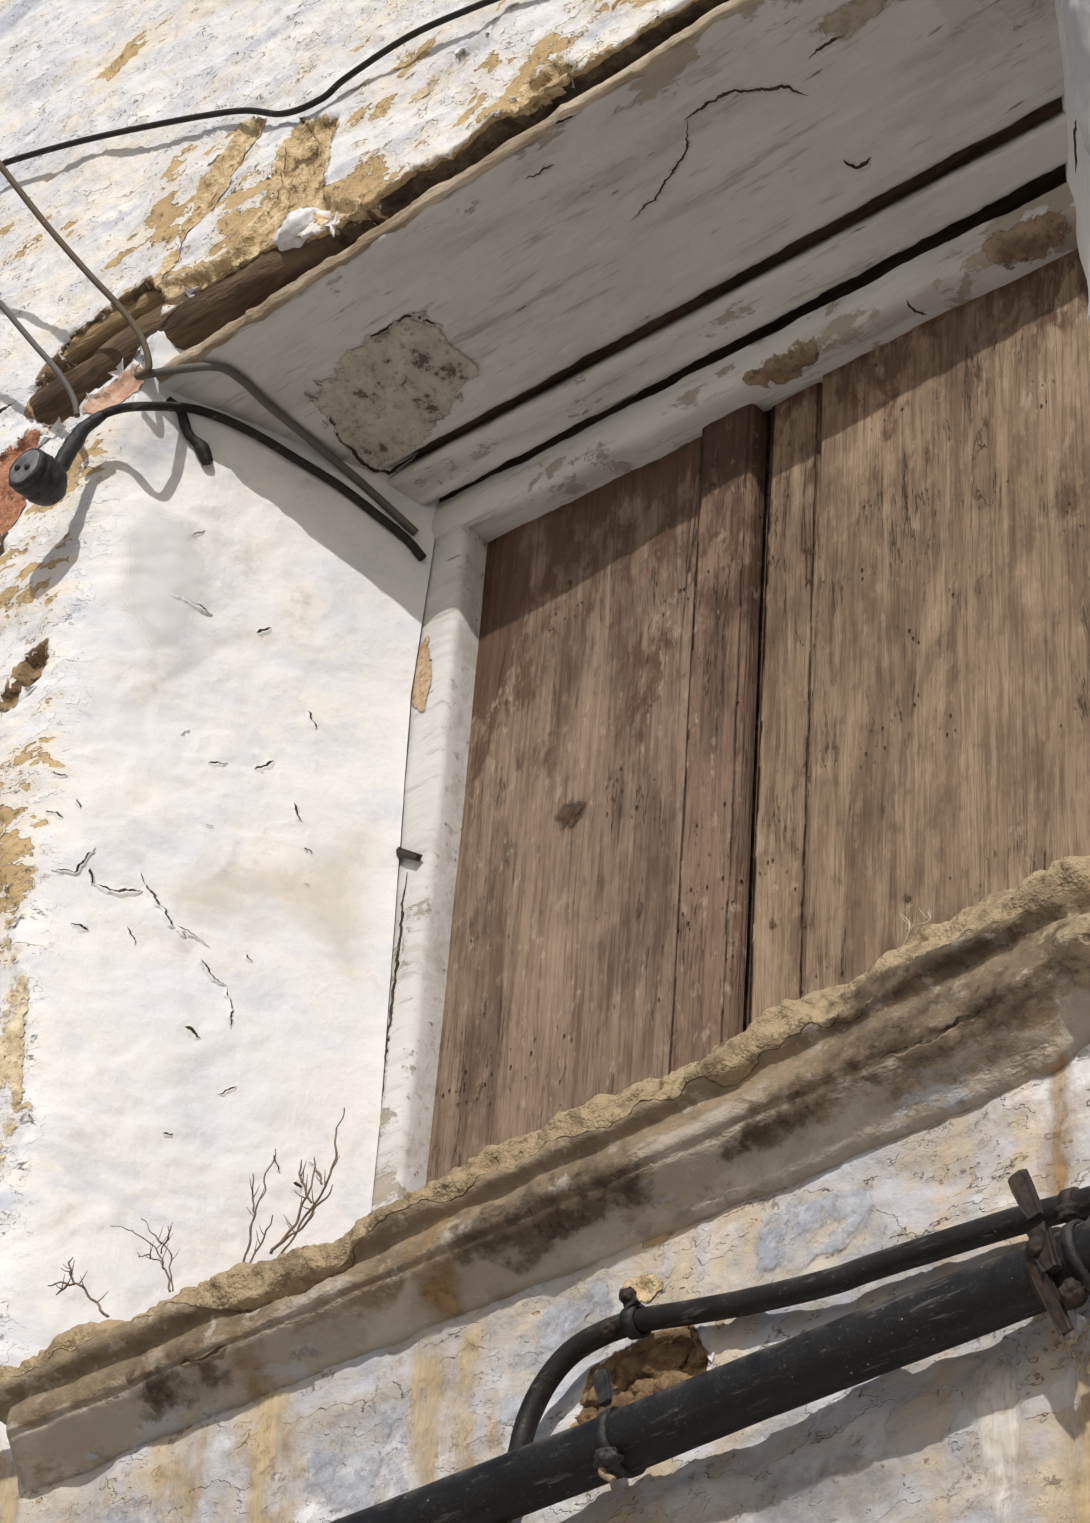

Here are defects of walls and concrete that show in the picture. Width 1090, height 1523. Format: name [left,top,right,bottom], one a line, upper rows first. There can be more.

crack [631,19,872,221]
spalling [0,114,390,556]
spalling [0,638,49,711]
peeling [411,635,432,712]
crack [51,848,235,1028]
crack [378,872,408,1138]
damp [826,920,1052,1090]
damp [721,1077,822,1162]
rust [1047,1058,1068,1196]
damp [448,1162,647,1273]
spalling [570,1325,715,1428]
rust [1074,1377,1090,1523]